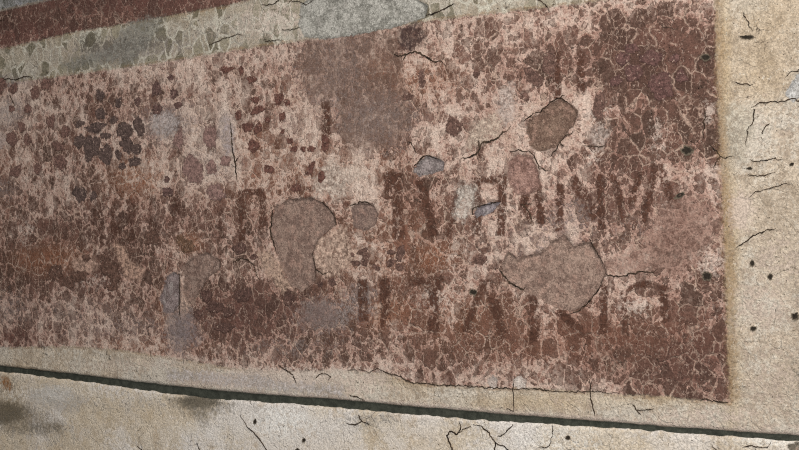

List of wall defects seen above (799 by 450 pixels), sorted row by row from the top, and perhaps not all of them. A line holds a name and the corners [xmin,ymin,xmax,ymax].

peeling [298,0,428,40]
peeling [220,66,257,84]
crack [392,50,444,64]
peeling [445,86,529,149]
peeling [507,99,578,195]
peeling [591,92,609,145]
crack [702,82,799,197]
peeling [231,93,405,306]
peeling [472,255,487,265]
spalling [502,235,606,312]
peeling [181,287,252,333]
crack [354,368,617,450]